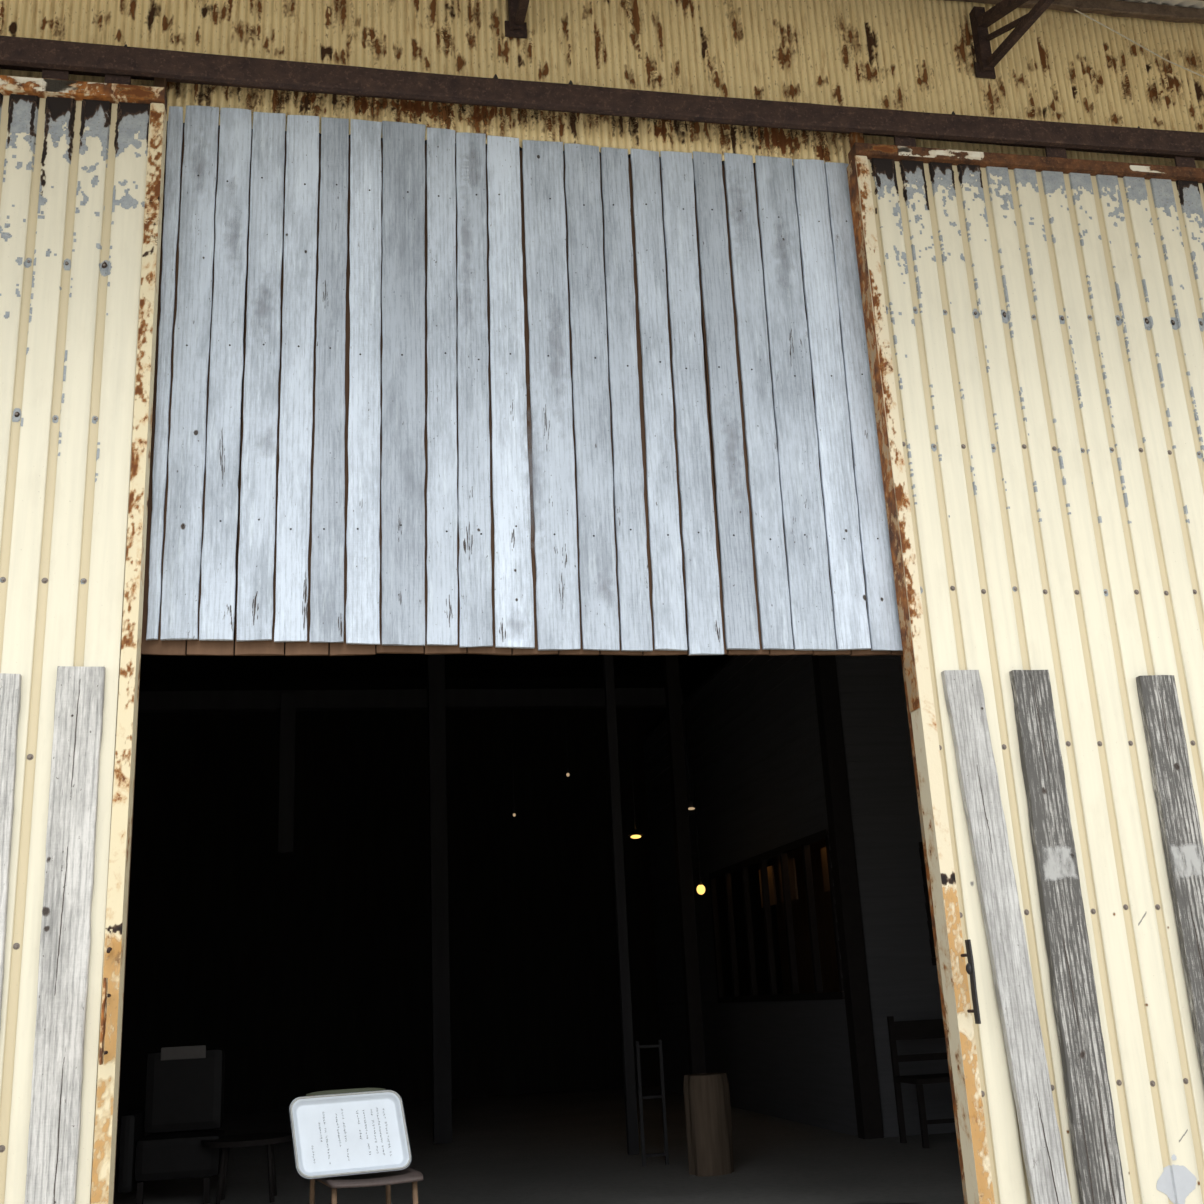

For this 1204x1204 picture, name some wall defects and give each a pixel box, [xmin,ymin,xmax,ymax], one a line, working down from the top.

corrosion [93,0,284,55]
corrosion [414,0,549,80]
corrosion [983,38,1204,130]
peeling [0,76,149,242]
corrosion [0,76,983,257]
peeling [0,232,76,322]
corrosion [135,274,156,402]
peeling [873,146,1204,362]
peeling [1086,275,1115,428]
peeling [1186,371,1204,462]
corrosion [126,426,144,564]
peeling [1109,444,1132,524]